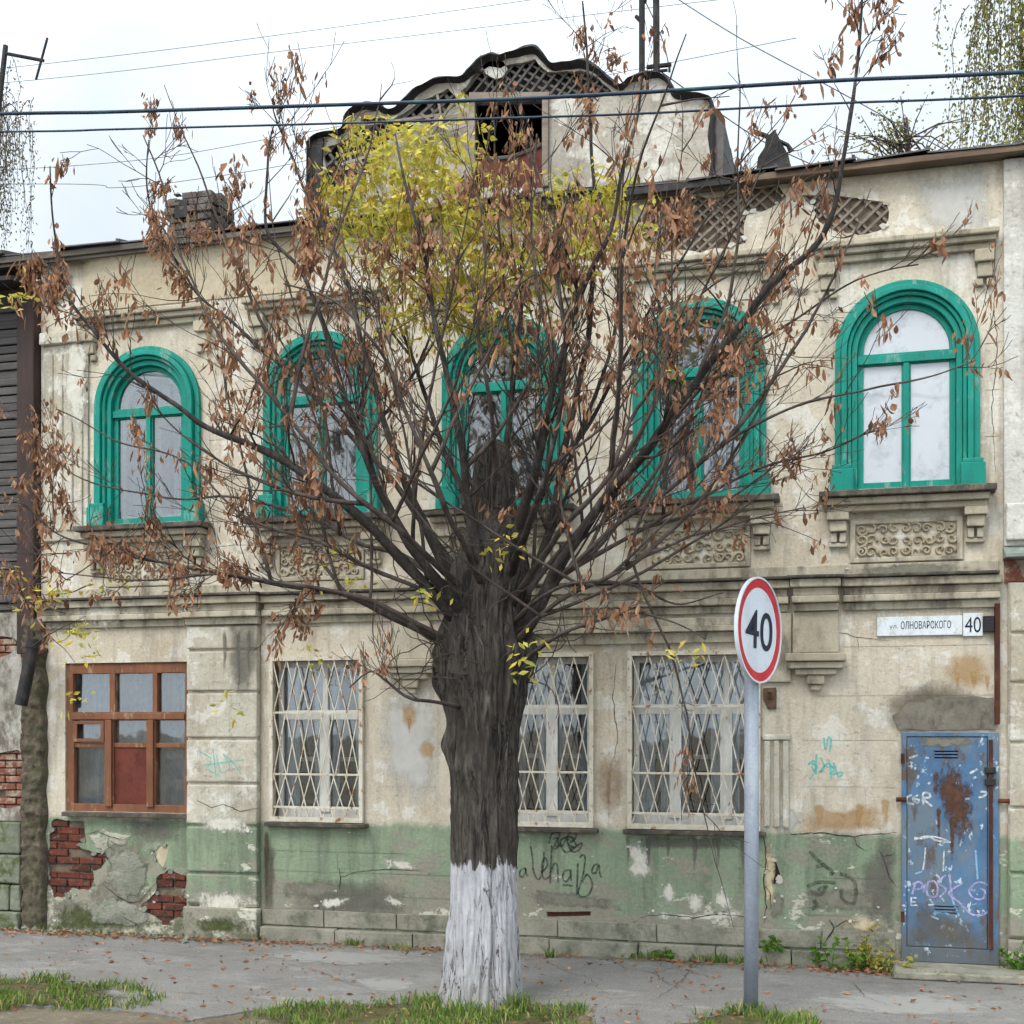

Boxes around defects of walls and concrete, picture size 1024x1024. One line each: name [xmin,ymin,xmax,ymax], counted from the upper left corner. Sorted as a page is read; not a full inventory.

spalling [639,185,787,252]
spalling [802,192,889,235]
spalling [0,636,17,657]
leakage [904,691,956,705]
leakage [383,691,435,797]
spalling [0,750,23,808]
leakage [815,805,870,828]
rust [933,769,973,854]
spalling [48,820,249,925]
peeling [626,841,652,878]
peeling [763,843,786,919]